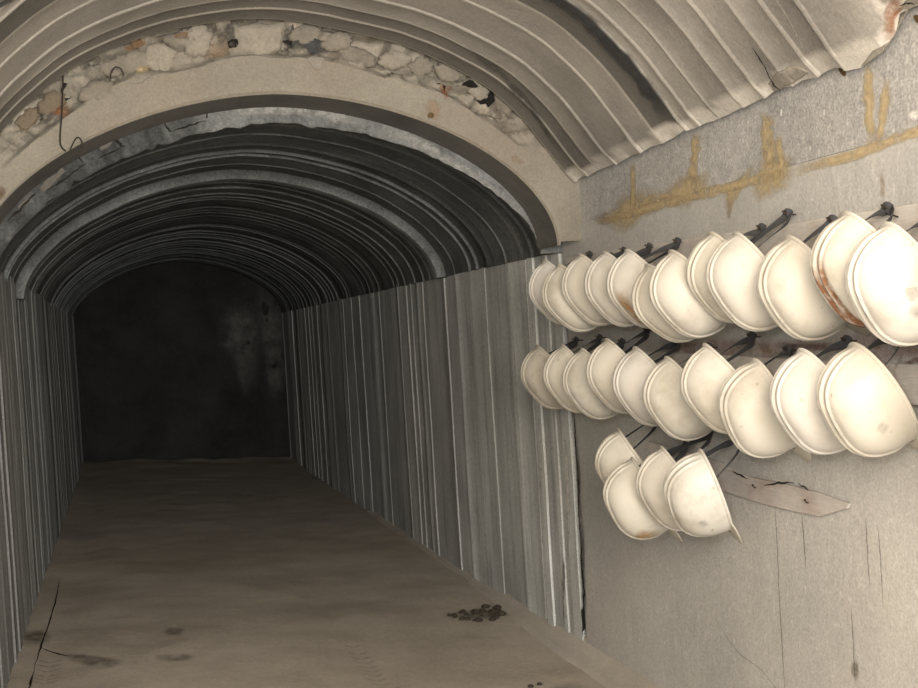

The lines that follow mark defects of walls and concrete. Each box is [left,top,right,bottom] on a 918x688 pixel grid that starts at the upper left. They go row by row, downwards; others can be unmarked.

spalling [14,24,214,131]
spalling [226,22,495,107]
peeling [18,168,65,209]
crack [28,579,69,688]
crack [775,514,785,688]
crack [850,610,858,674]
crack [866,527,883,600]